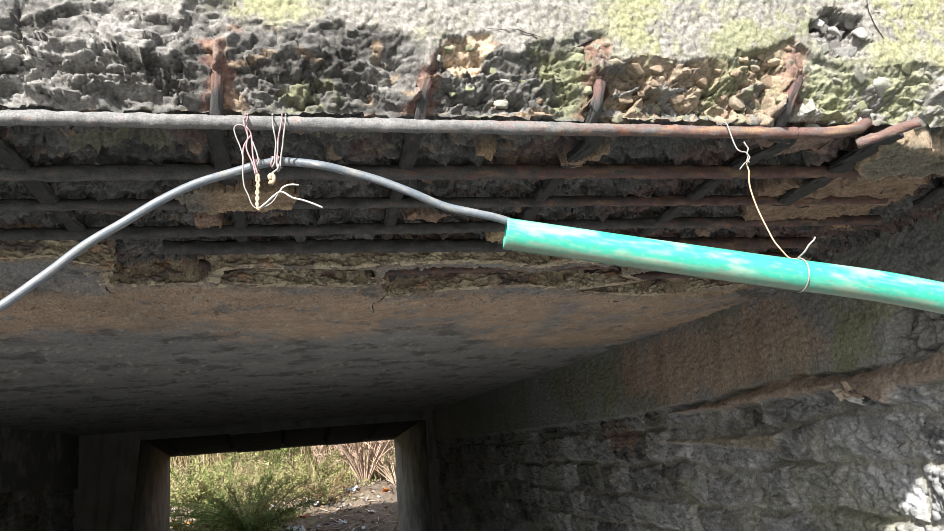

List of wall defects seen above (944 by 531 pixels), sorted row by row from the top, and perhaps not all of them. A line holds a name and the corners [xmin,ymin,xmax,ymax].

corrosion [195,37,236,113]
spalling [0,0,944,300]